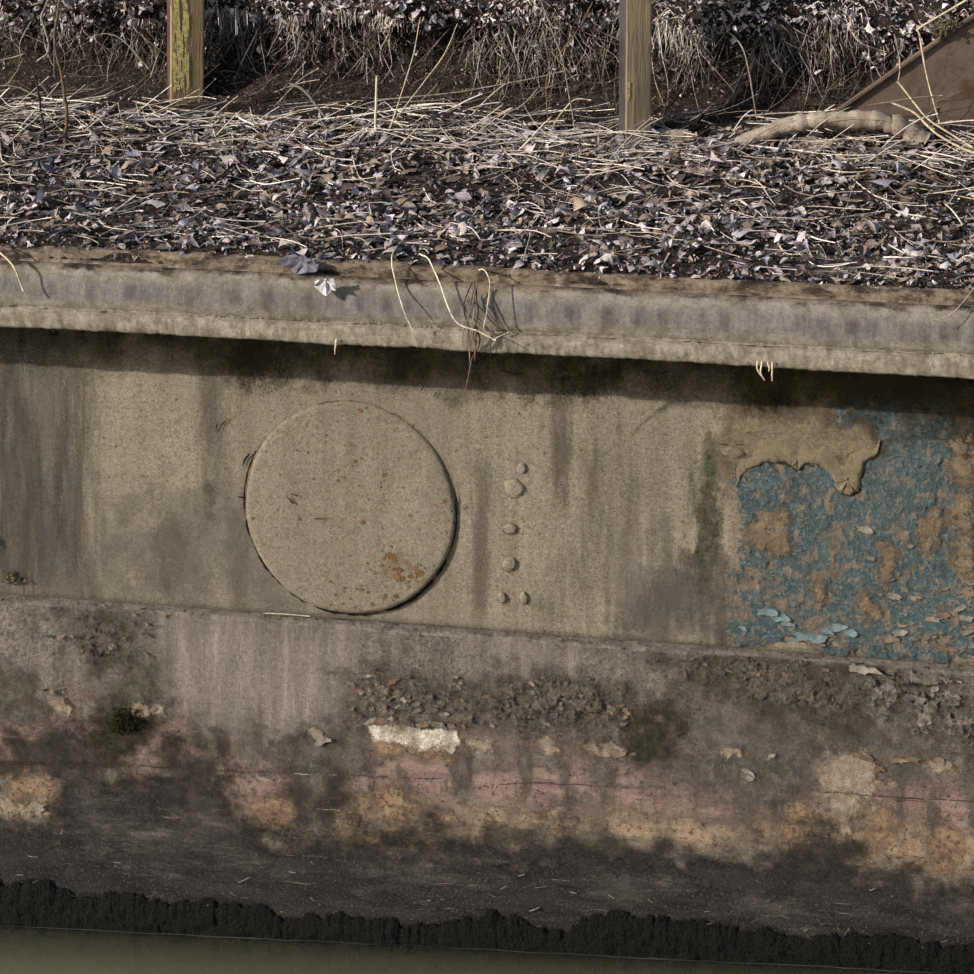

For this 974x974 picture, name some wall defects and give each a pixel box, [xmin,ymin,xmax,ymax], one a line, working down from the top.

corrosion [366,540,435,588]
leakage [0,327,974,949]
peeling [336,659,768,837]
spalling [644,371,974,837]